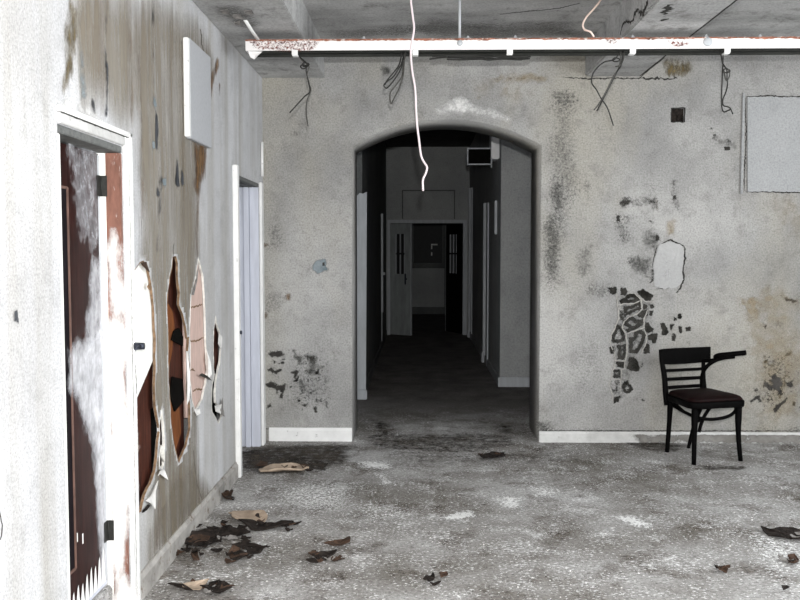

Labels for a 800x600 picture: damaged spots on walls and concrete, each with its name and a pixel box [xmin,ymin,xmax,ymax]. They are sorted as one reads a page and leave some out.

rust [245,36,800,51]
damp [665,61,690,76]
peeling [608,239,691,403]
spalling [135,245,225,513]
damp [265,351,322,413]
damp [750,351,795,413]